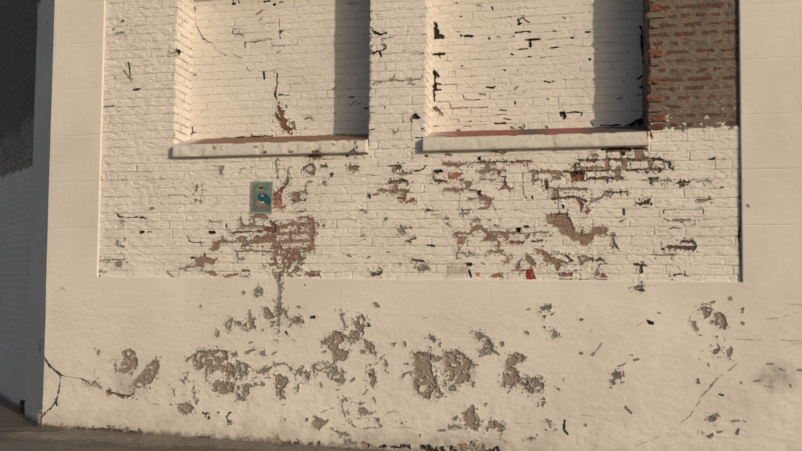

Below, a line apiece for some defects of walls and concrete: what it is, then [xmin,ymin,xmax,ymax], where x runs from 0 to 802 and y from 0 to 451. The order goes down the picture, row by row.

peeling [345,141,723,280]
crack [39,339,158,417]
flaking render [108,348,161,392]
flaking render [272,302,569,451]
flaking render [689,301,737,367]